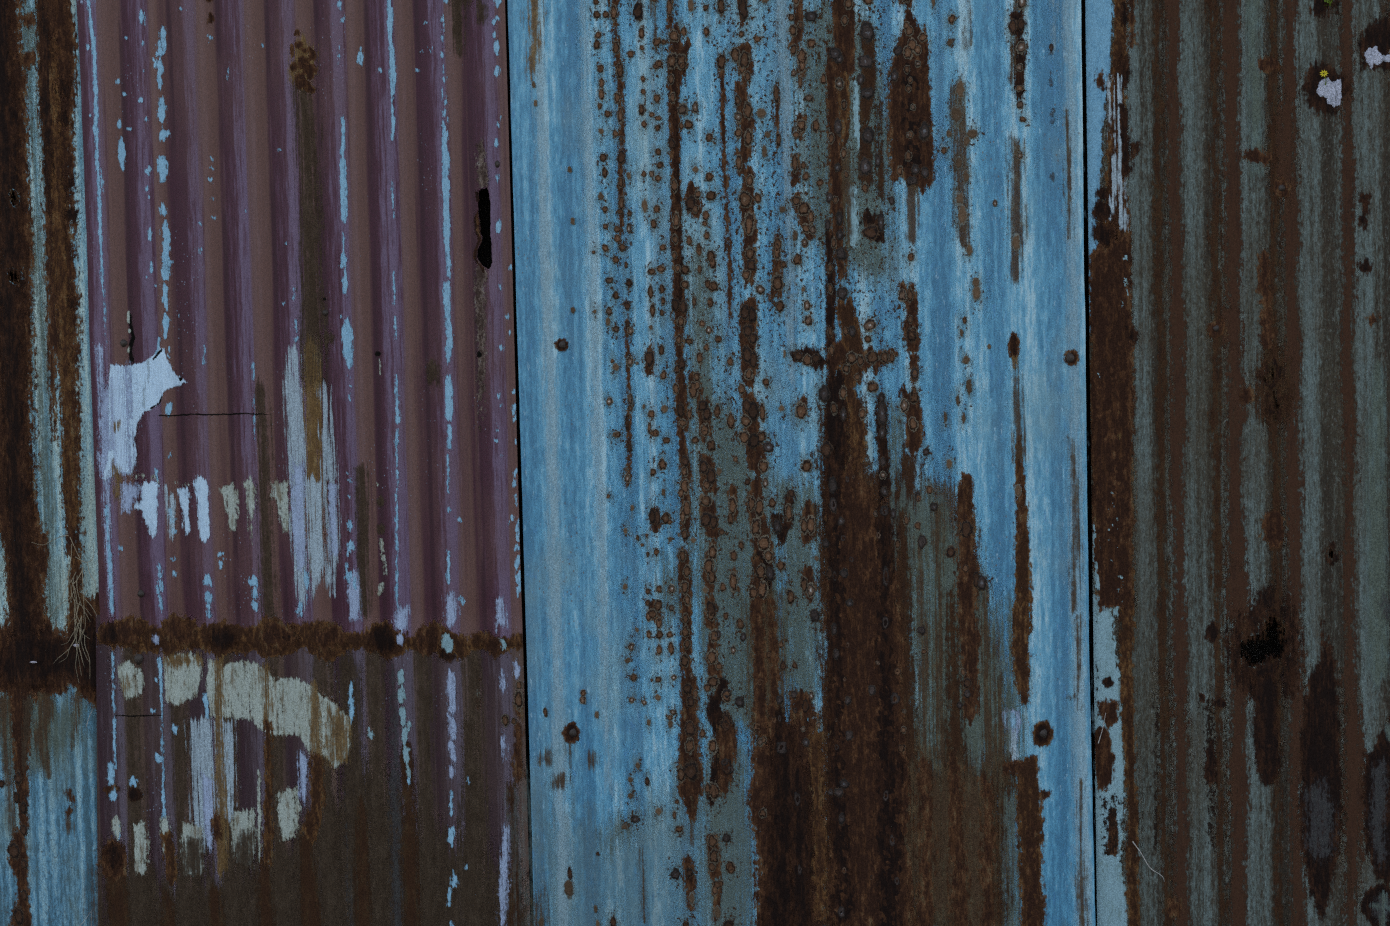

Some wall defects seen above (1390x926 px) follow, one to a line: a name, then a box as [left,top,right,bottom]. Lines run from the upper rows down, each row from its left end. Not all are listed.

peeling [1364,46,1390,70]
peeling [80,0,107,425]
peeling [115,10,179,359]
corrosion [0,0,544,926]
corrosion [589,0,1054,926]
peeling [101,480,123,616]
peeling [203,551,224,613]
peeling [248,575,258,612]
peeling [107,653,137,802]
peeling [150,656,178,819]
peeling [348,682,373,739]
corrosion [579,689,599,719]